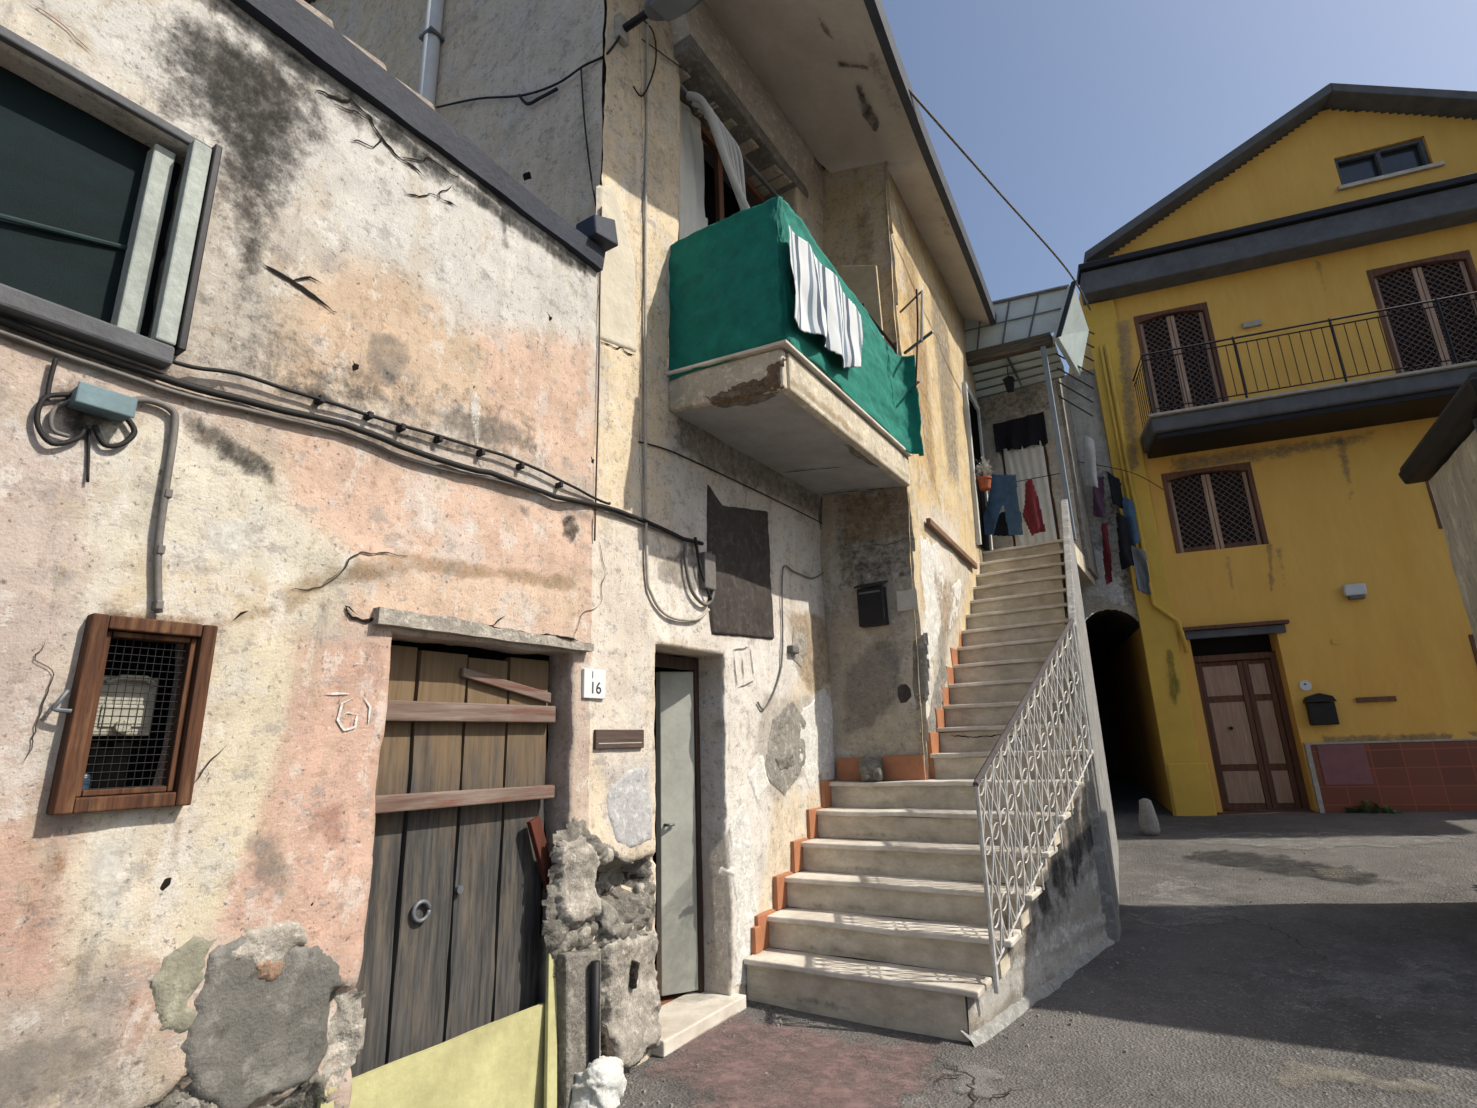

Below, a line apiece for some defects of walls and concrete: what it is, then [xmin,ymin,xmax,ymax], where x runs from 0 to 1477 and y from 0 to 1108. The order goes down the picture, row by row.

damp [179,0,586,274]
crack [316,90,460,207]
crack [264,264,336,312]
spalling [704,358,786,408]
crack [291,551,404,623]
crack [489,542,606,641]
peeling [897,536,962,736]
damp [1039,787,1094,912]
spalling [542,765,662,1074]
damp [999,914,1106,980]
spalling [145,1084,218,1108]
spalling [262,983,366,1108]